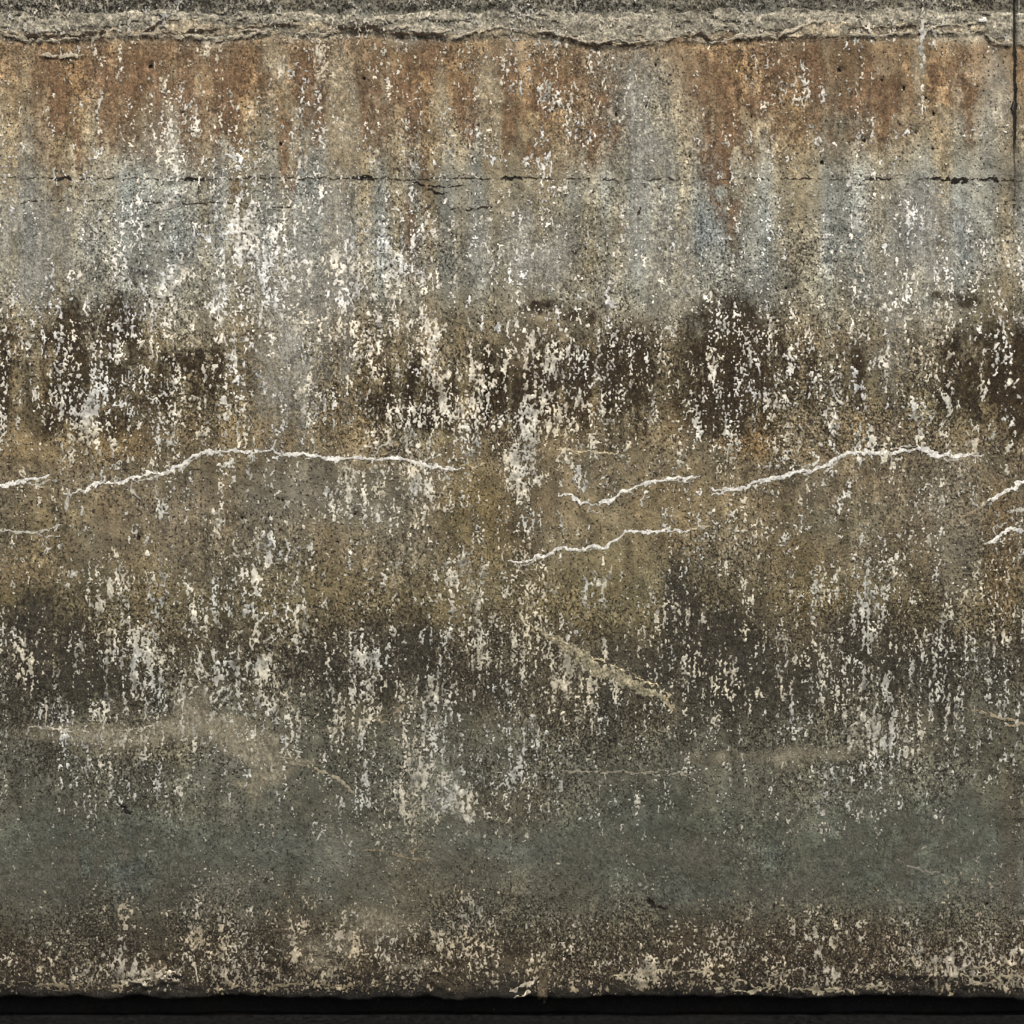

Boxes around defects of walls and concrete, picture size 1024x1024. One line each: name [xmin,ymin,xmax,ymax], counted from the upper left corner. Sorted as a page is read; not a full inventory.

corrosion [31,39,271,171]
corrosion [279,42,329,192]
corrosion [499,51,608,155]
corrosion [689,37,901,234]
leakage [35,290,225,438]
leakage [366,325,660,437]
leakage [675,296,817,436]
leakage [937,321,1024,436]
crack [0,441,485,539]
crack [508,525,712,567]
crack [557,445,983,514]
crack [963,479,1024,545]